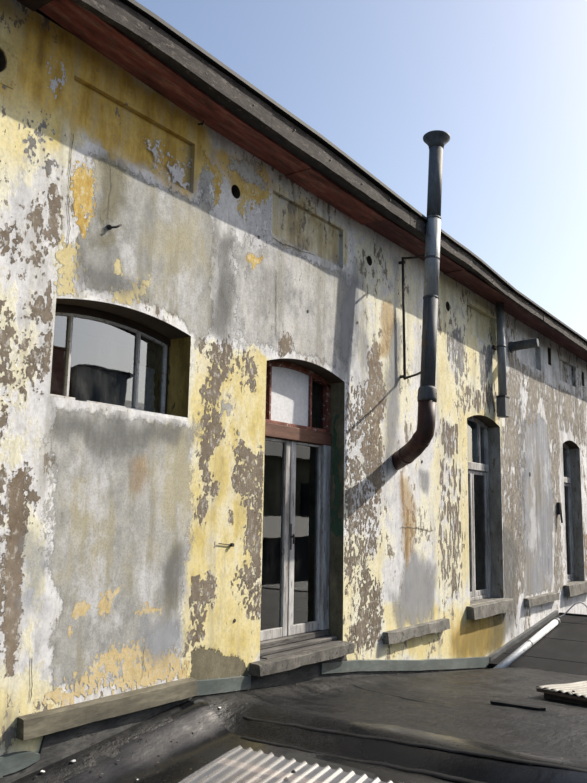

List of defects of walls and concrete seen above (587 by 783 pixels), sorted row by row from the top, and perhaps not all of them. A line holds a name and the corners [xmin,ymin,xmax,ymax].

peeling [0,111,68,439]
peeling [145,139,215,207]
leakage [214,240,232,337]
leakage [341,274,357,362]
peeling [0,461,41,680]
peeling [183,569,217,657]
peeling [194,335,264,620]
peeling [344,340,387,654]
peeling [437,418,466,598]
peeling [445,324,587,615]